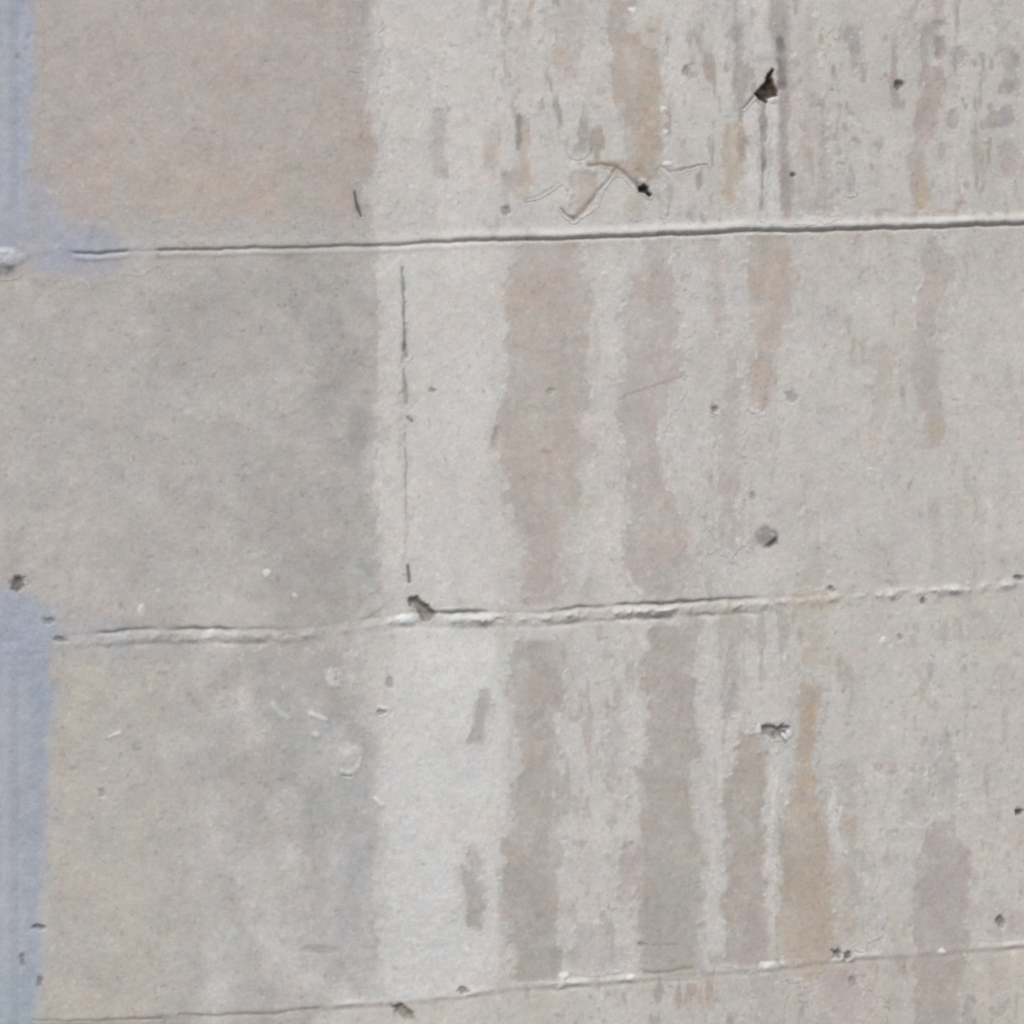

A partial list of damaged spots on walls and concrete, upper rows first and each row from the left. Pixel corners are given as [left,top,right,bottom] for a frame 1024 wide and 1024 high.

crack [523,161,710,224]
spalling [741,66,780,222]
leakage [478,0,887,614]
crack [348,264,416,627]
spalling [384,593,463,640]
spalling [755,720,794,747]
leakage [203,622,890,1024]